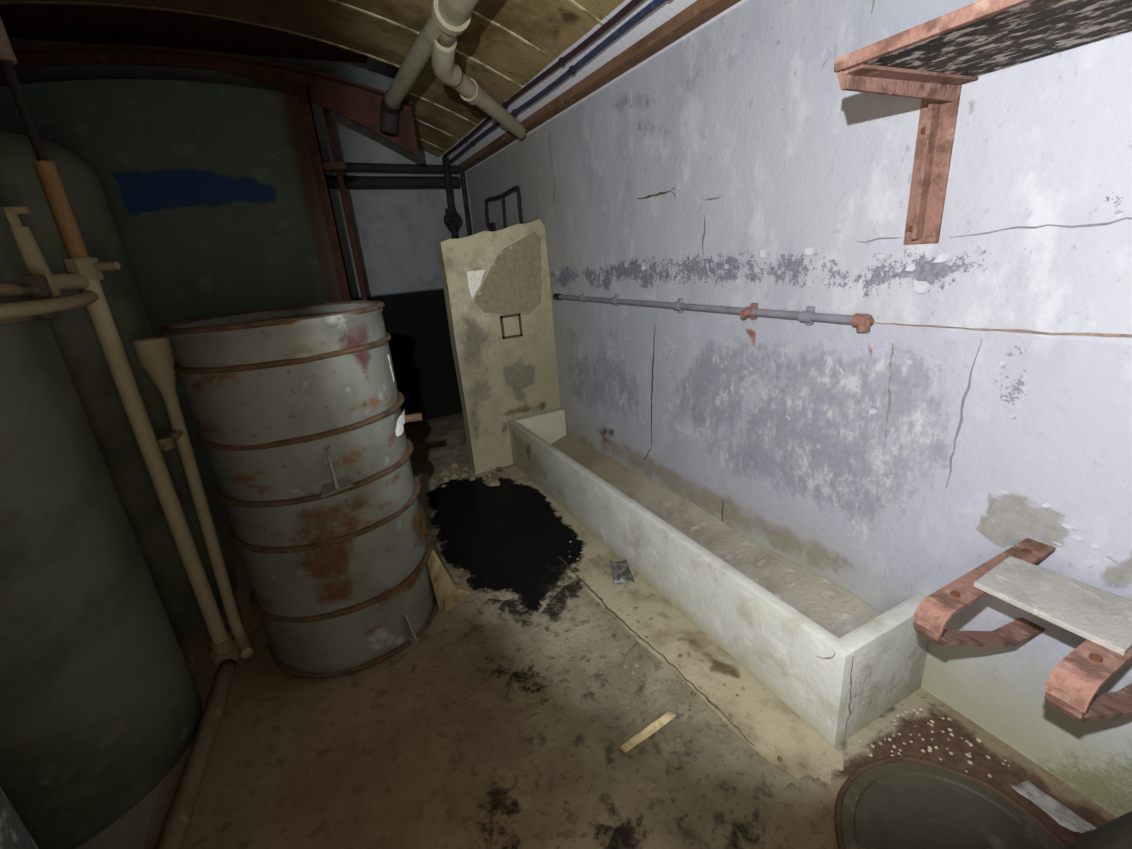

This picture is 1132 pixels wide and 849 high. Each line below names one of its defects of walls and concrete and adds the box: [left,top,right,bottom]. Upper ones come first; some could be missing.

peeling [467,232,986,315]
crack [858,236,902,244]
crack [950,217,1132,238]
crack [644,324,655,478]
peeling [664,338,940,542]
crack [875,322,1132,489]
water stain [427,476,584,626]
flaking render [978,489,1132,586]
crack [816,654,853,739]